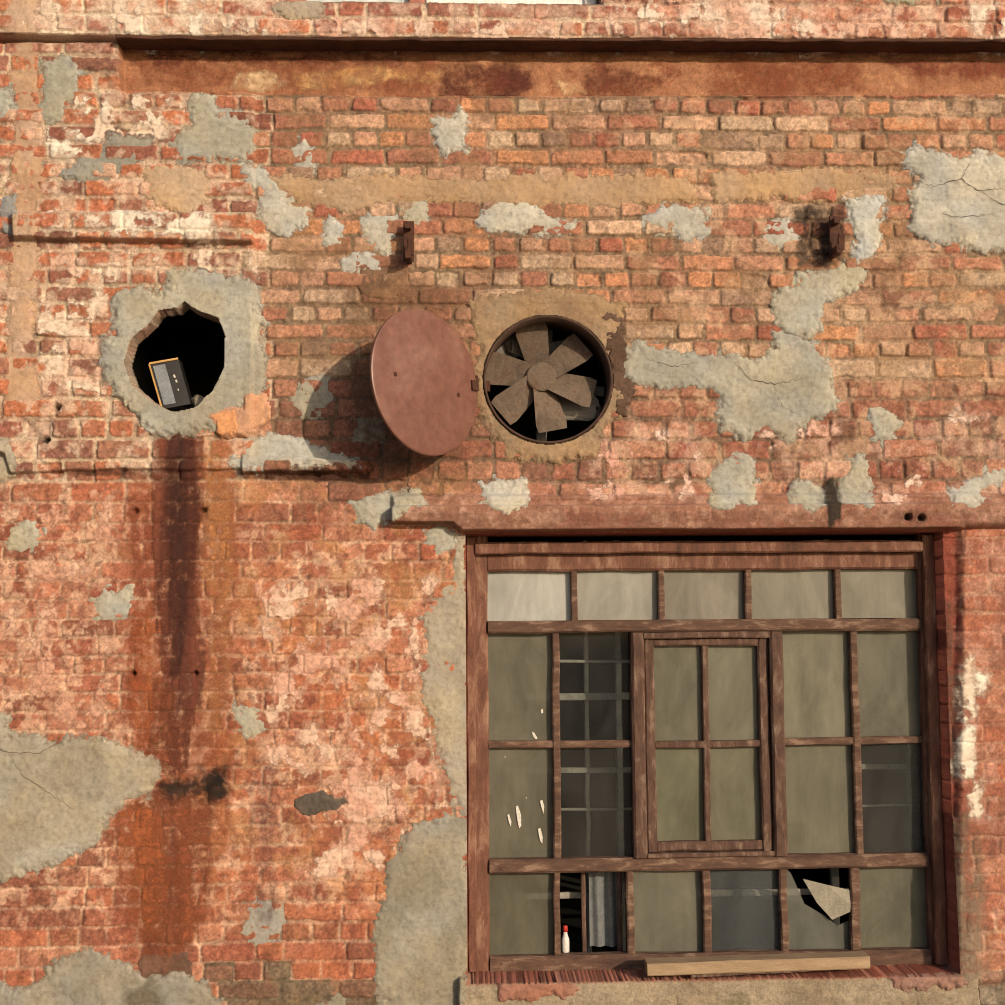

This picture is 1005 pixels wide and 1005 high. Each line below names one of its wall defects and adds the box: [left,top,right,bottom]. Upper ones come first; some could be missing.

peeling [37,208,223,418]
spalling [209,392,271,440]
peeling [655,430,682,447]
peeling [798,420,840,443]
peeling [948,408,990,424]
peeling [587,449,633,501]
peeling [679,453,701,501]
peeling [877,474,922,505]
leakage [947,603,956,760]
crack [0,740,72,809]
spalling [137,952,192,978]